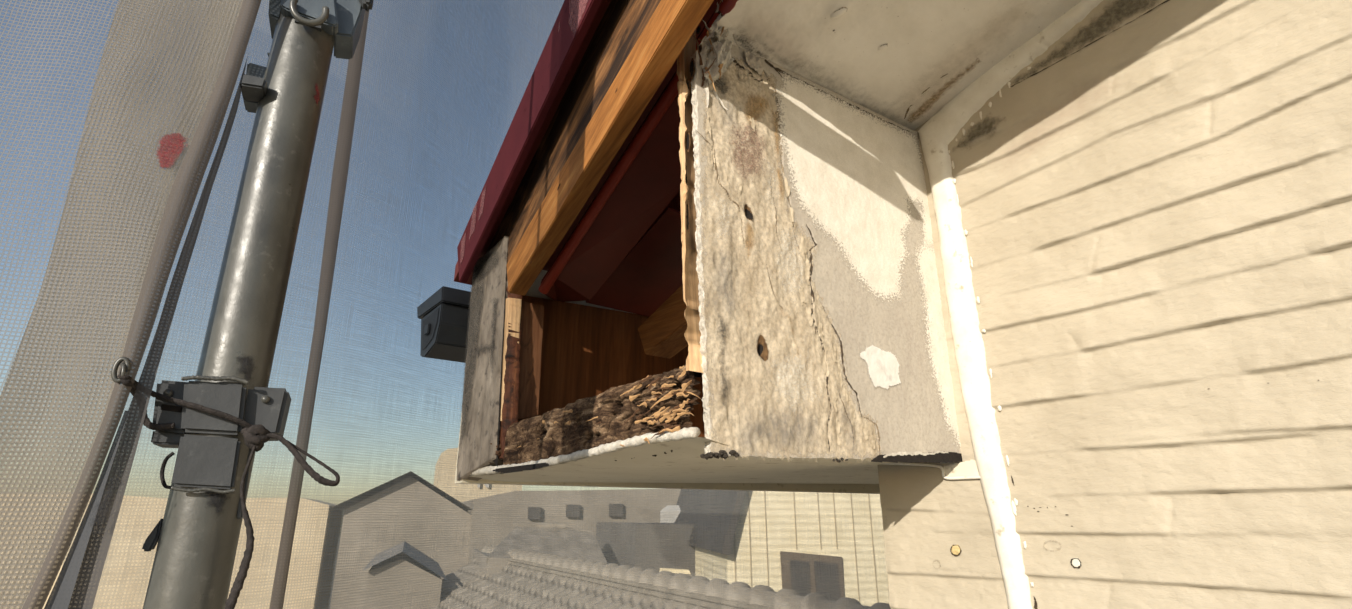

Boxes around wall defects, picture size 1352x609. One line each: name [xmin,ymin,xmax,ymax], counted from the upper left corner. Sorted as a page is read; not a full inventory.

crack [697,131,744,240]
peeling [700,13,961,461]
crack [764,59,963,463]